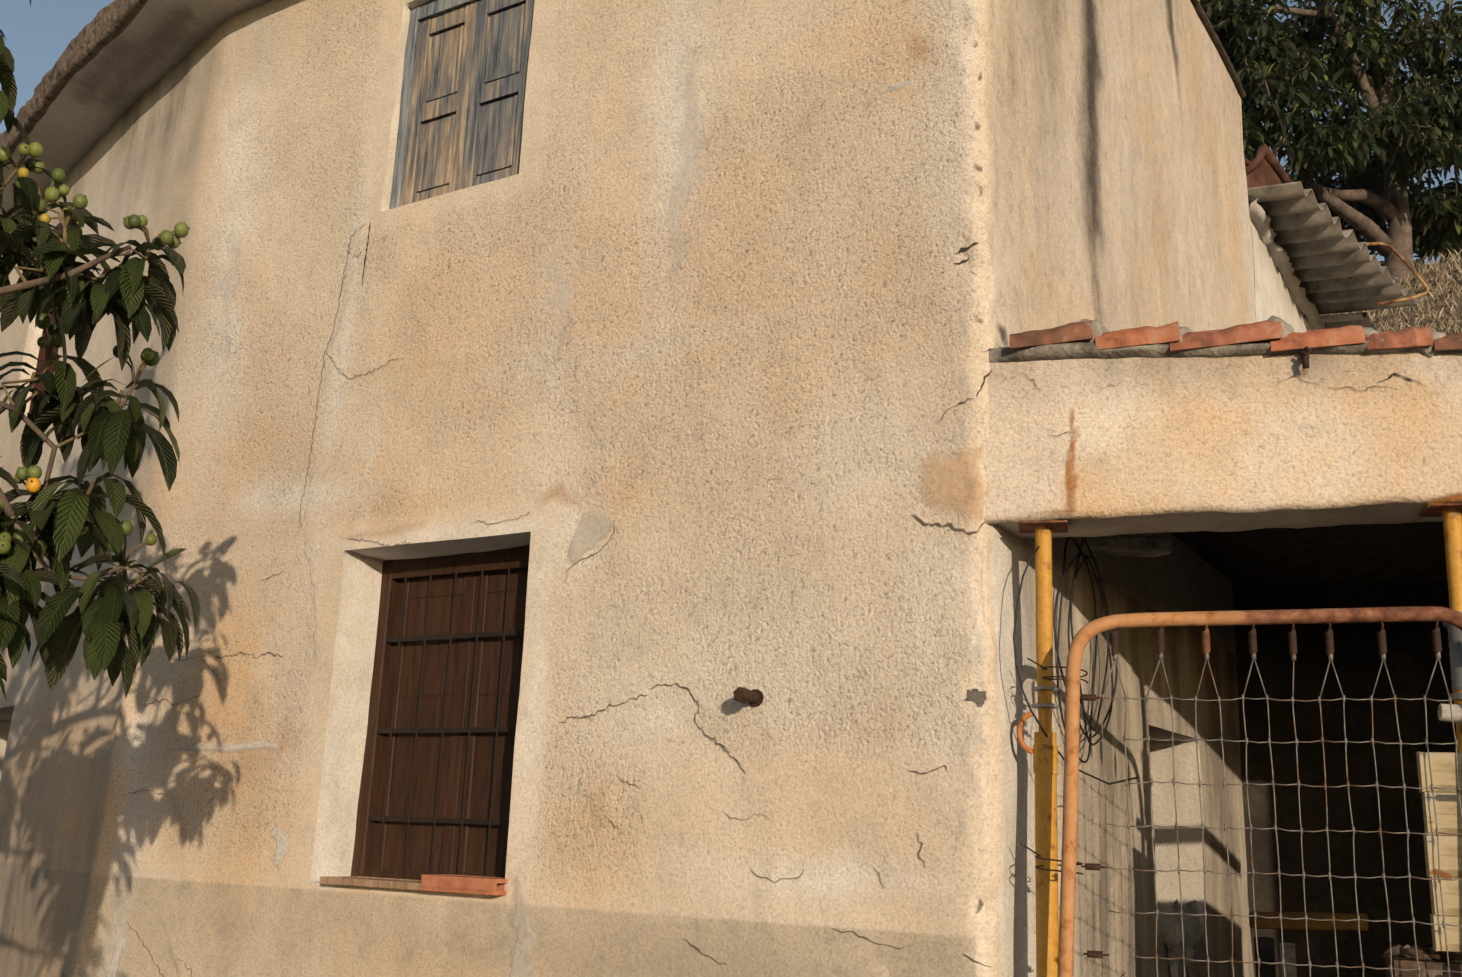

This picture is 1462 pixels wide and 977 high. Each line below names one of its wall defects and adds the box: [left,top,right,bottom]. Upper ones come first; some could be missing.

water stain [1167,0,1177,61]
water stain [1083,0,1099,227]
crack [299,225,404,526]
crack [940,348,1040,420]
crack [1278,372,1421,391]
peeling [928,451,985,513]
rust [1067,416,1075,512]
crack [144,651,282,706]
crack [563,683,746,774]